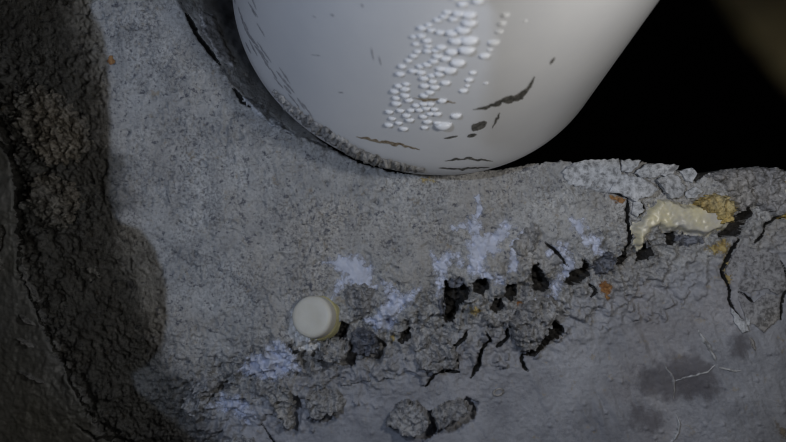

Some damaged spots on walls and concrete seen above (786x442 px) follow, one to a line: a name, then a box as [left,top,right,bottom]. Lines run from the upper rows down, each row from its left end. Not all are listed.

crack [0,116,164,442]
efflorescence [237,308,320,382]
spalling [319,321,380,363]
efflorescence [322,254,421,332]
spalling [438,276,490,323]
efflorescence [430,194,524,298]
spalling [490,263,564,357]
water stain [545,241,575,307]
peeling [561,158,786,333]
crack [720,217,781,319]
crack [778,261,786,320]
spalling [385,397,470,437]